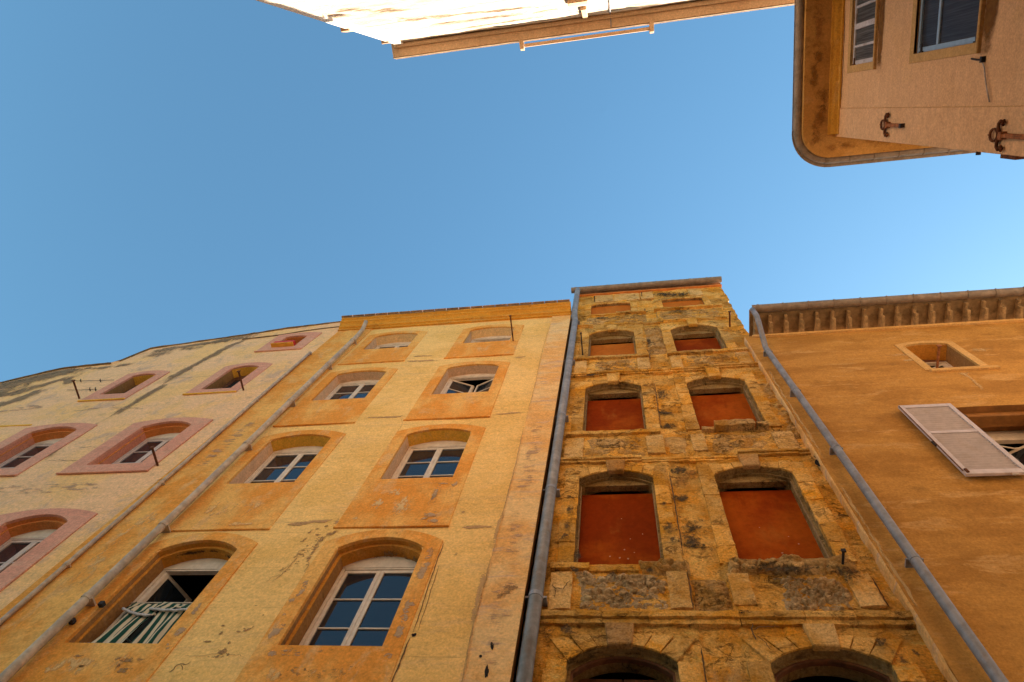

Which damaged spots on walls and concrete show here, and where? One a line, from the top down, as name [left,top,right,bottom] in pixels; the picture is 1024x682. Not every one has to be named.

leakage [0,368,78,406]
leakage [117,336,248,413]
peeling [280,519,339,572]